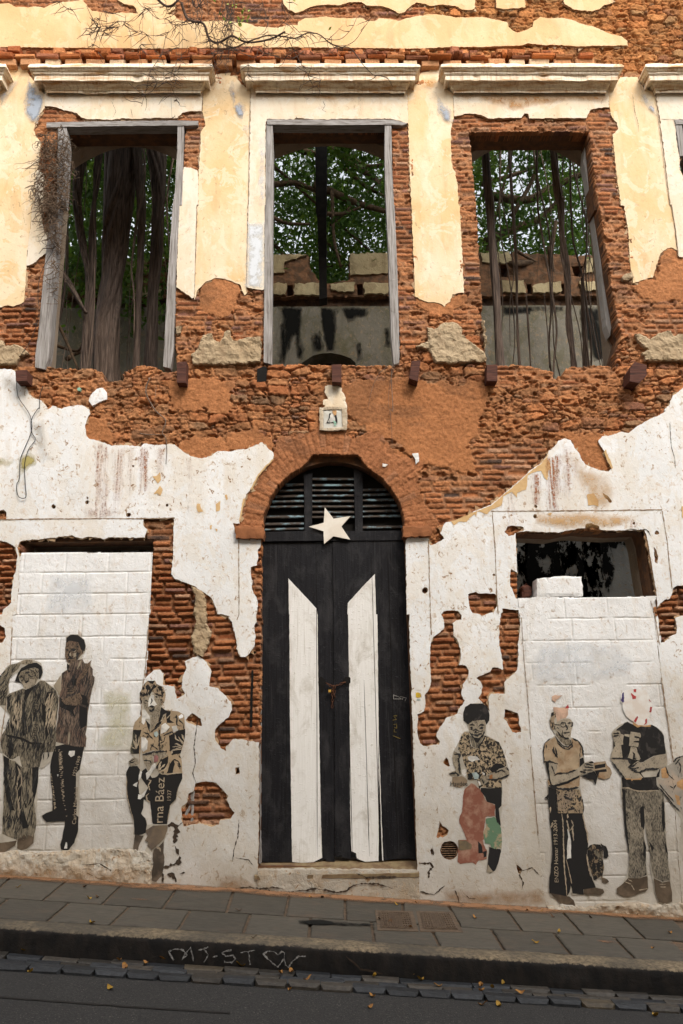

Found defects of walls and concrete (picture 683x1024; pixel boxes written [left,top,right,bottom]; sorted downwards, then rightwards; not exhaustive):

spalling [22,48,90,64]
spalling [0,0,136,14]
spalling [174,0,683,87]
spalling [0,107,683,545]
spalling [0,542,29,642]
spalling [144,519,263,751]
spalling [417,571,532,746]
spalling [653,586,683,642]
spalling [181,781,234,826]